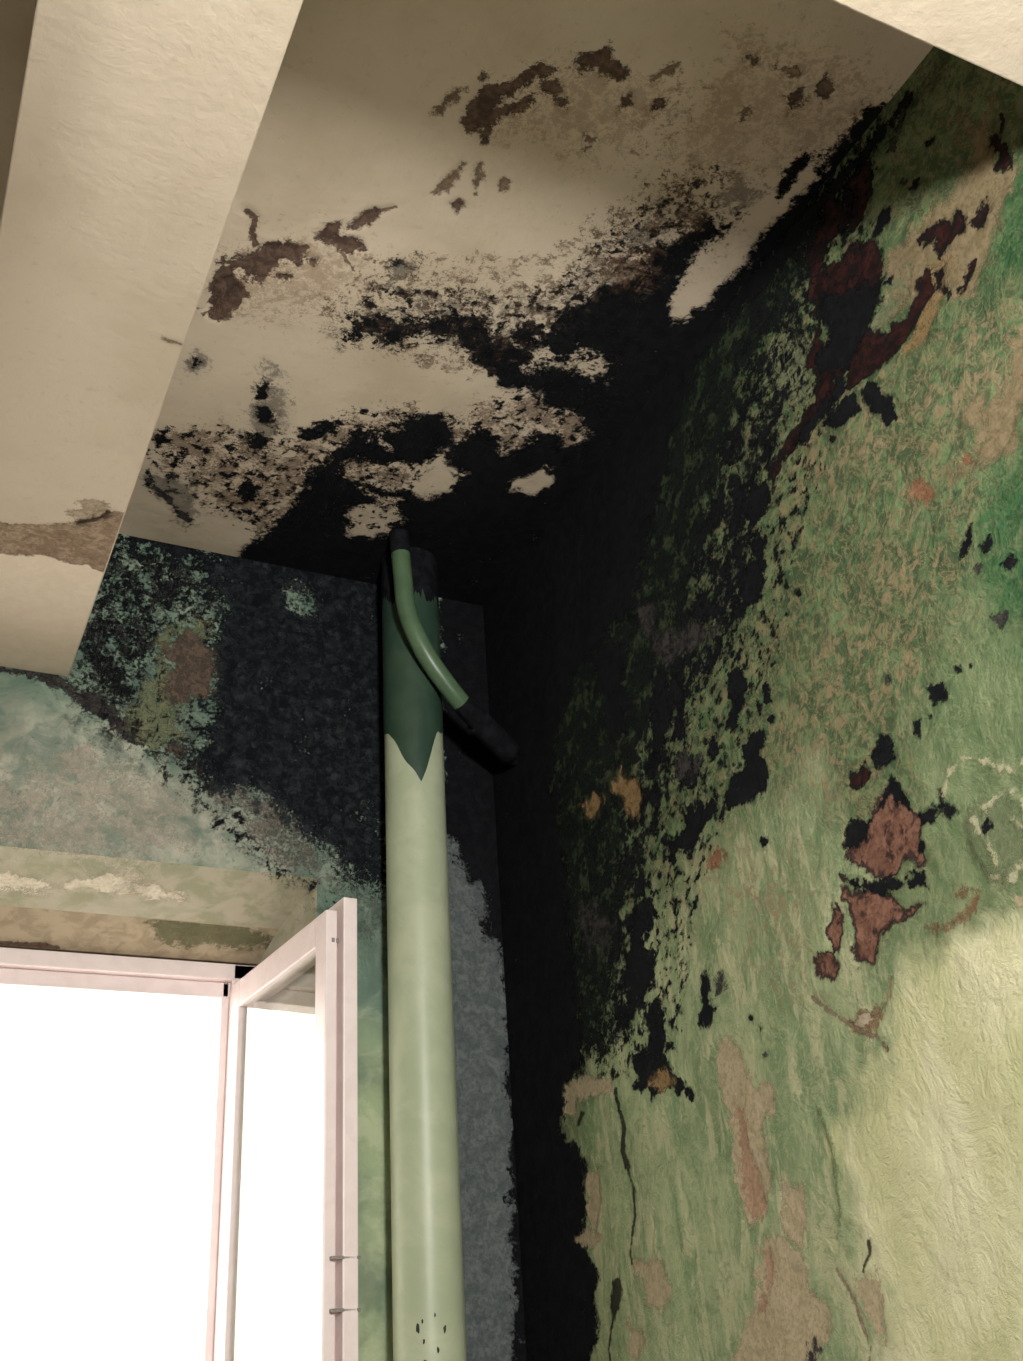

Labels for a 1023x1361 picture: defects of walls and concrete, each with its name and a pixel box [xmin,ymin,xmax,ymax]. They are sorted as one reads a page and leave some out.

peeling [774,65,834,109]
spalling [201,273,292,322]
leakage [793,381,898,449]
leakage [146,426,214,488]
spalling [0,499,124,572]
leakage [696,654,768,771]
leakage [717,727,771,824]
spalling [813,773,960,982]
leakage [144,920,272,951]
leakage [697,970,728,1029]
crack [608,1088,636,1361]
peeling [714,1033,834,1361]